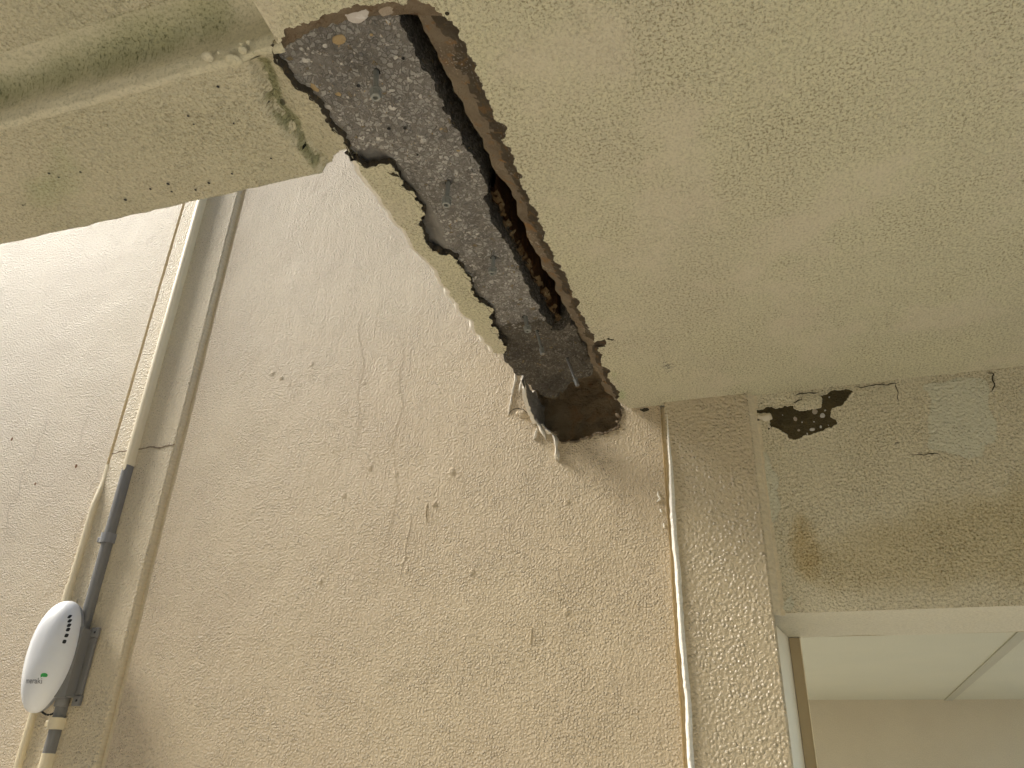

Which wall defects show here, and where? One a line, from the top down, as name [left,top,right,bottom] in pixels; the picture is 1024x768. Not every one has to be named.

spalling [271,0,623,462]
spalling [755,387,856,442]
crack [856,383,898,399]
crack [88,444,175,494]